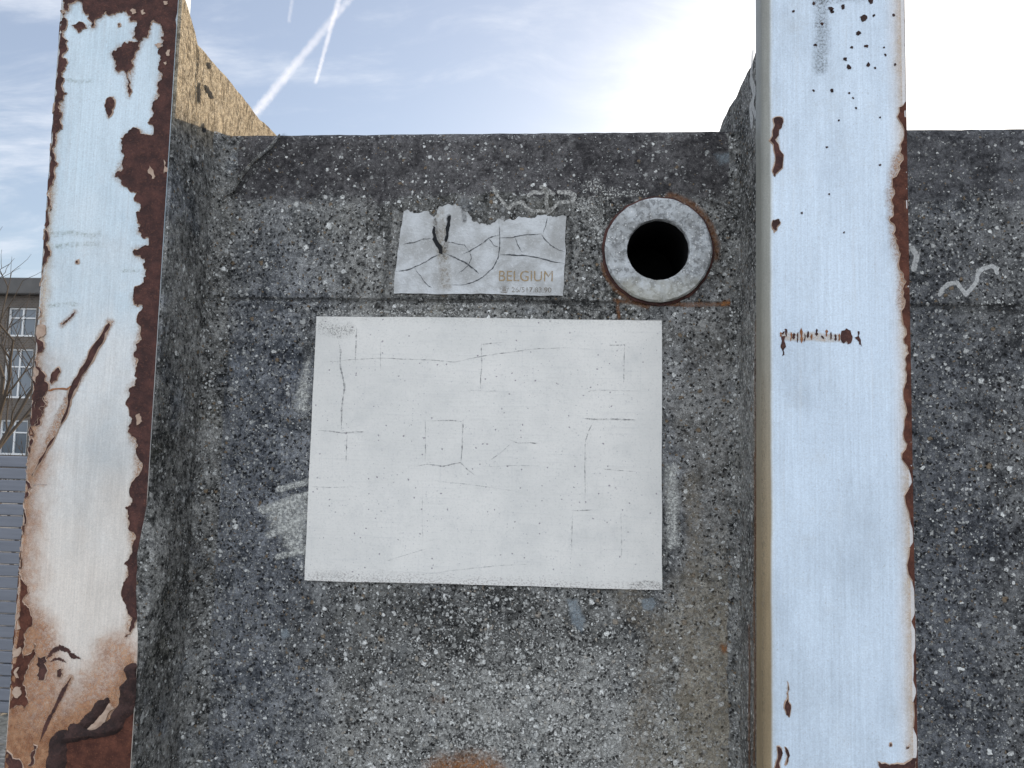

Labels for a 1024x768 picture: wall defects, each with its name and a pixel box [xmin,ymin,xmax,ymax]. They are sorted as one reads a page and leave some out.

crack [401,220,562,287]
rust [601,194,730,318]
peeling [9,0,178,709]
rust [5,618,135,768]